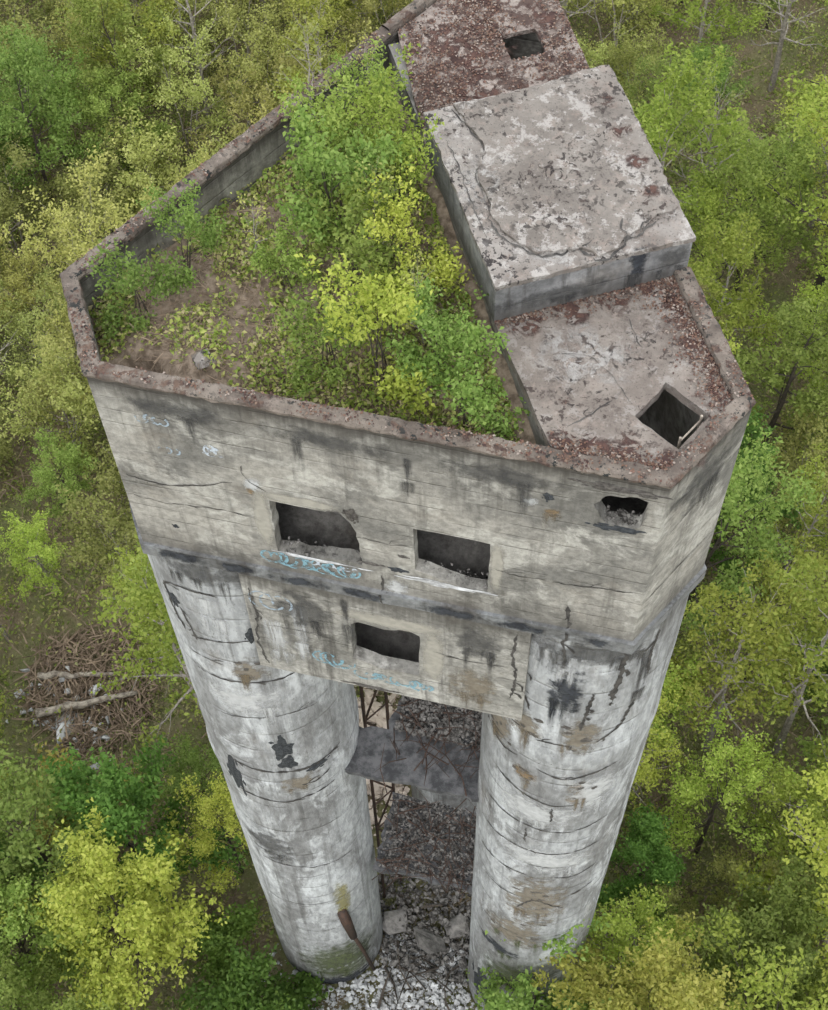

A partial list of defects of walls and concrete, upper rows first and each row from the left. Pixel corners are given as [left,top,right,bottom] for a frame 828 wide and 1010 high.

crack [444,109,669,261]
crack [163,580,339,685]
water stain [499,622,651,719]